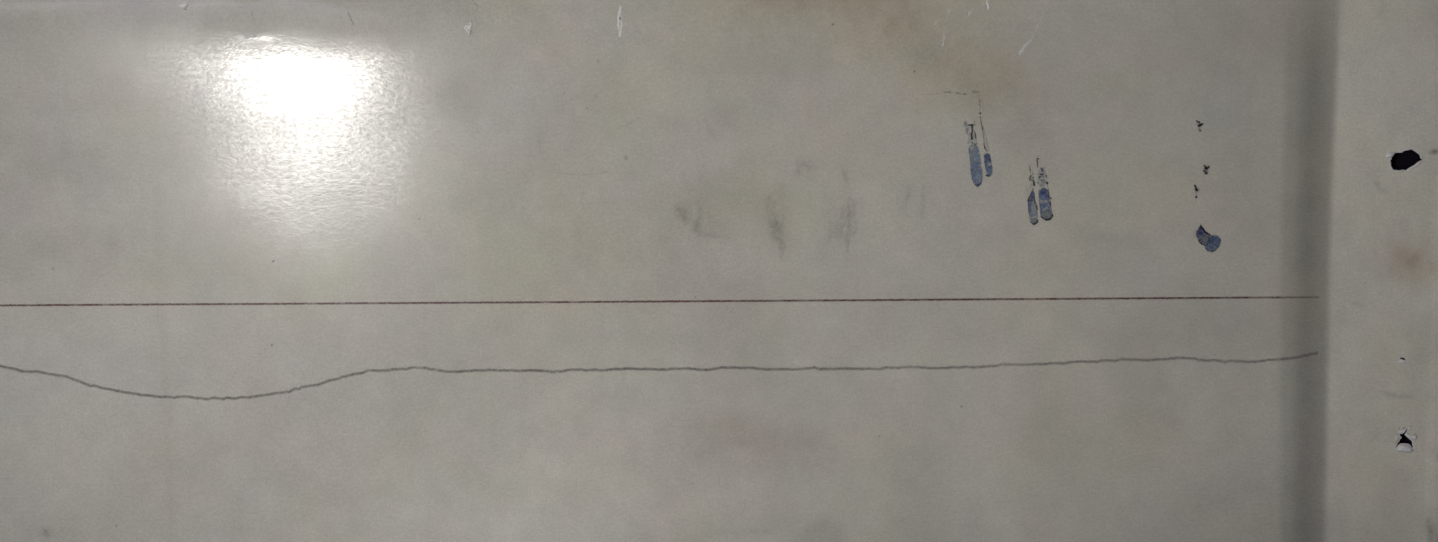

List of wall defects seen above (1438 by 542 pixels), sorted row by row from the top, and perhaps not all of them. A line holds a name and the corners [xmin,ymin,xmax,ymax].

peeling [1386,148,1423,172]
peeling [1396,428,1417,453]